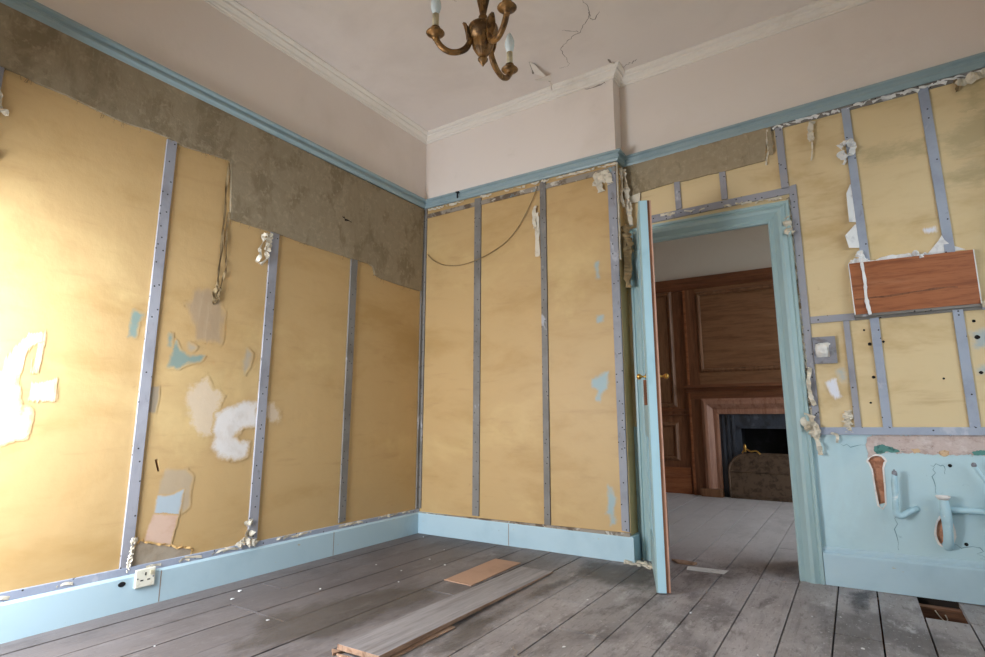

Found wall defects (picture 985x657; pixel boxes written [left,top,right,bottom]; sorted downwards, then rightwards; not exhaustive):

crack [560,2,599,68]
flaking render [866,435,985,458]